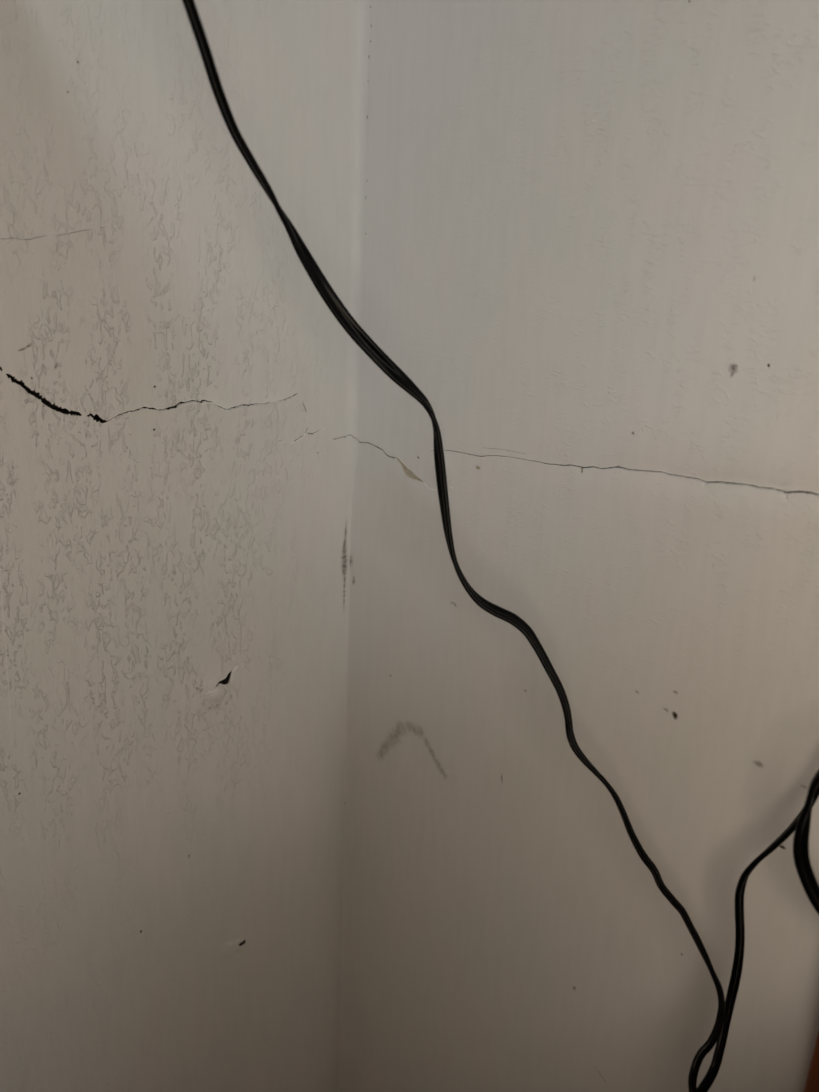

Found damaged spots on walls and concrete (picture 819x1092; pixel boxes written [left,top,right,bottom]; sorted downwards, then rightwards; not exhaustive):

crack [0,367,396,460]
crack [447,448,819,498]